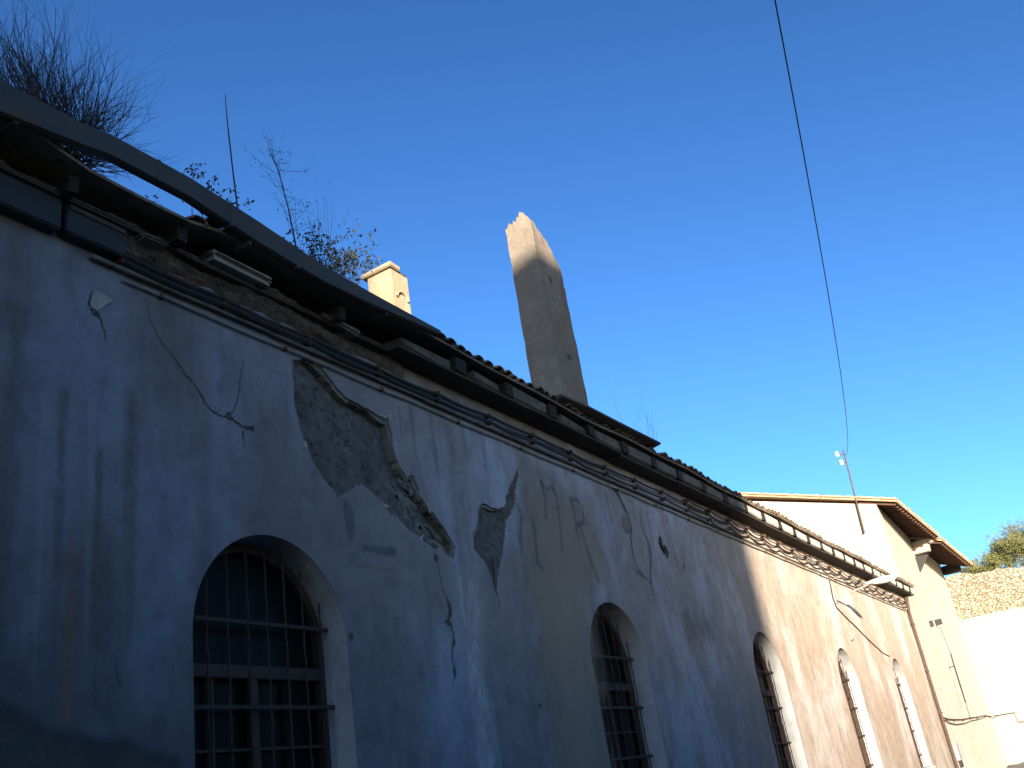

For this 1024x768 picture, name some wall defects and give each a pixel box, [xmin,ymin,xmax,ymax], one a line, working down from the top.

crack [145,299,255,445]
flaking render [293,358,455,563]
flaking render [473,470,518,594]
crack [437,563,456,680]